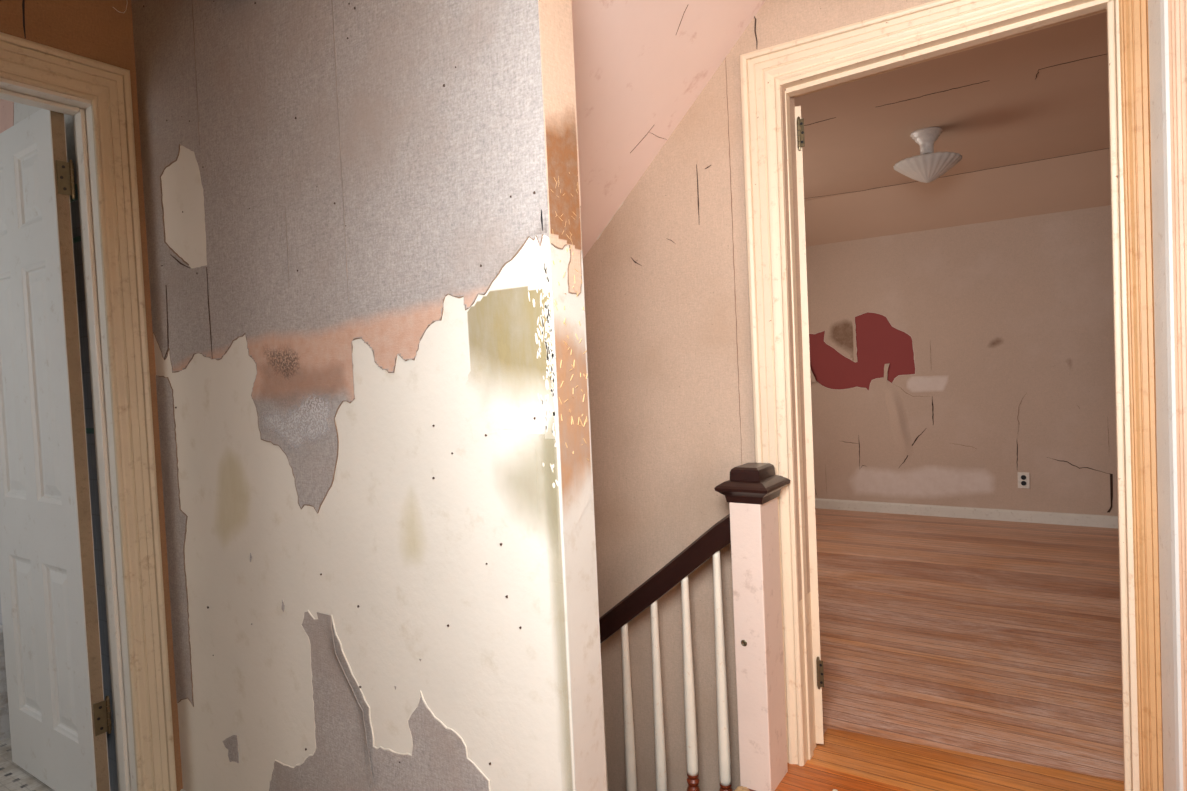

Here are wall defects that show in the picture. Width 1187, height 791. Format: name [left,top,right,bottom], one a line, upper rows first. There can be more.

water stain [172,236,559,488]
crack [1047,457,1113,513]
peeling [223,735,239,763]